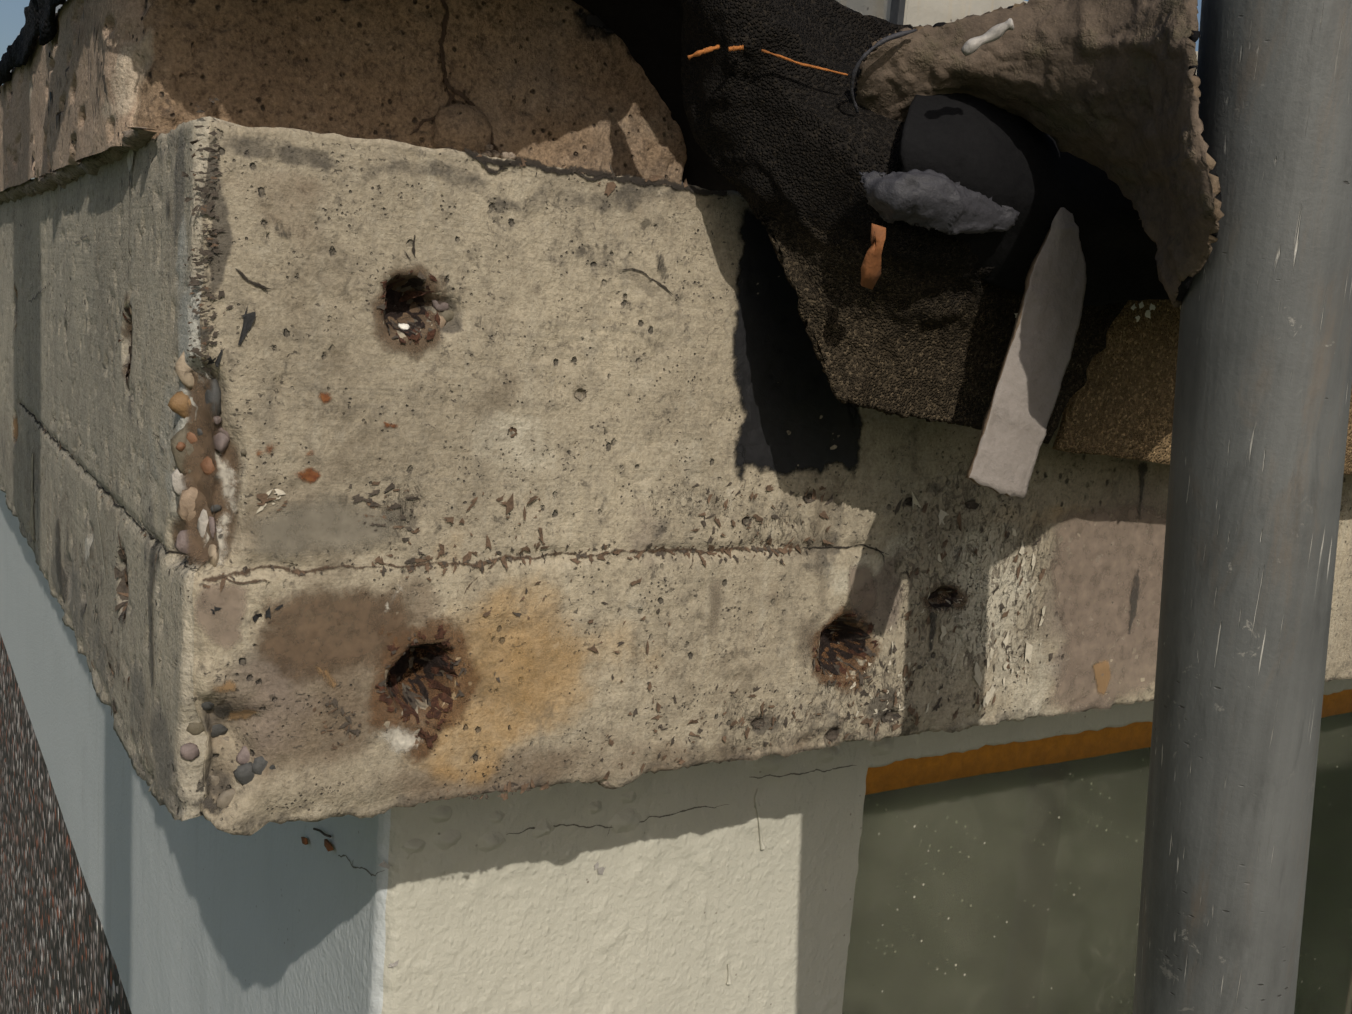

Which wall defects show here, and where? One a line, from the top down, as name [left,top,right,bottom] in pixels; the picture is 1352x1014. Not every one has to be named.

crack [410,0,475,135]
crack [464,133,727,200]
spalling [238,306,256,345]
spalling [168,349,247,567]
peeling [257,489,287,513]
crack [19,403,889,593]
leakage [197,585,245,645]
leakage [260,589,408,678]
corrosion [375,624,467,748]
peeling [594,482,1053,789]
corrosion [813,609,879,688]